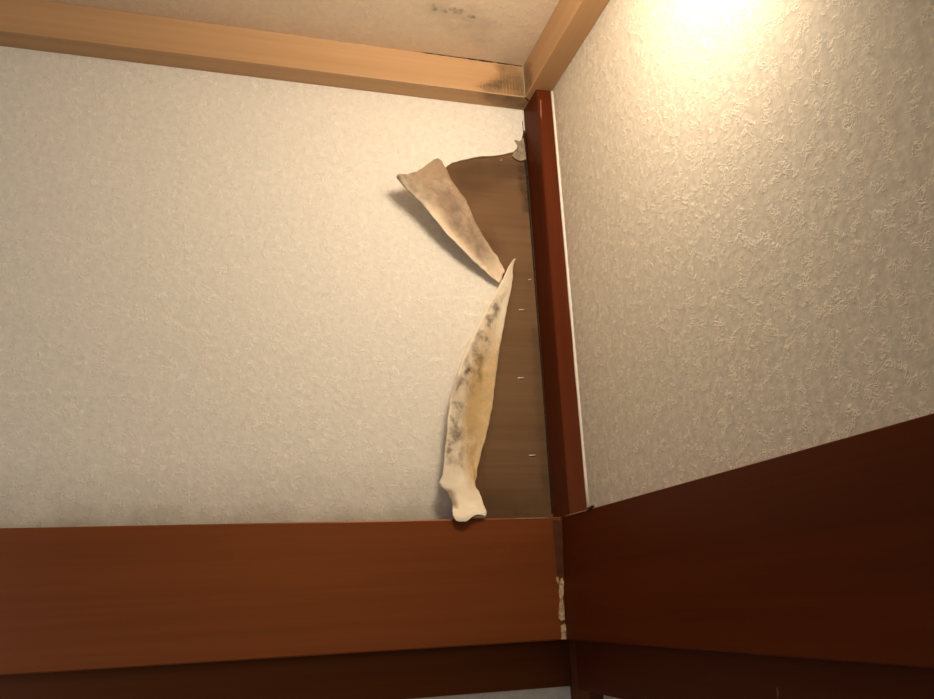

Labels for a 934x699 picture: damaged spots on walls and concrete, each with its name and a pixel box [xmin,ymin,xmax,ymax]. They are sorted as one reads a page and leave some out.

leakage [455,355,497,479]